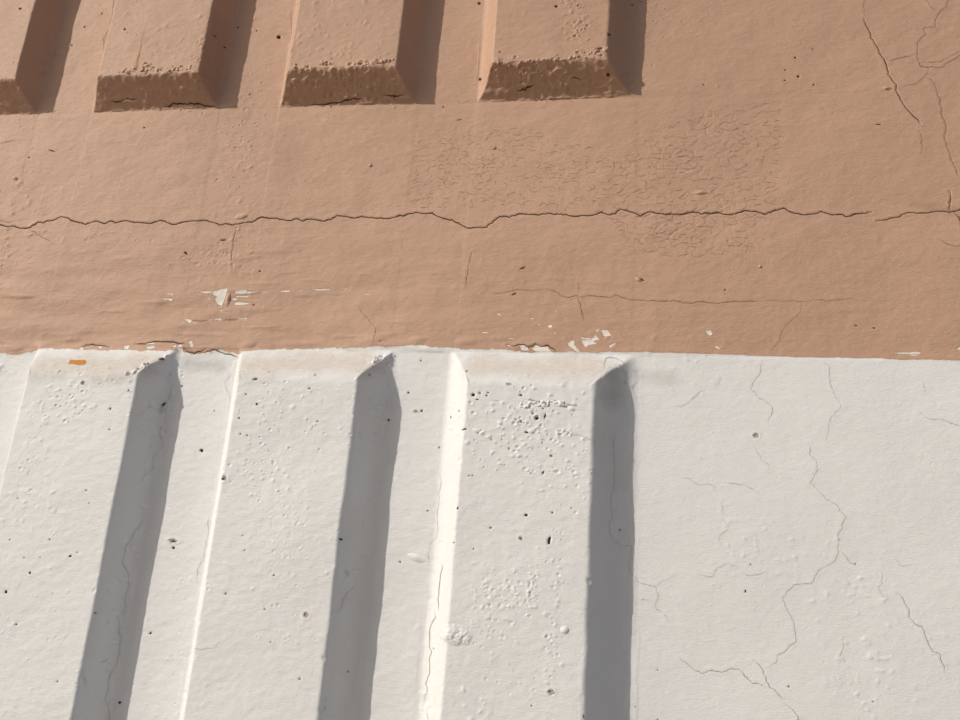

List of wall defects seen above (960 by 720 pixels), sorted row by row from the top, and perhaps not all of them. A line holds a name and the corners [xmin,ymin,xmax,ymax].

crack [0,0,960,260]
peeling [200,288,264,321]
peeling [508,338,550,352]
peeling [568,330,615,352]
crack [684,363,857,720]
crack [879,581,946,673]